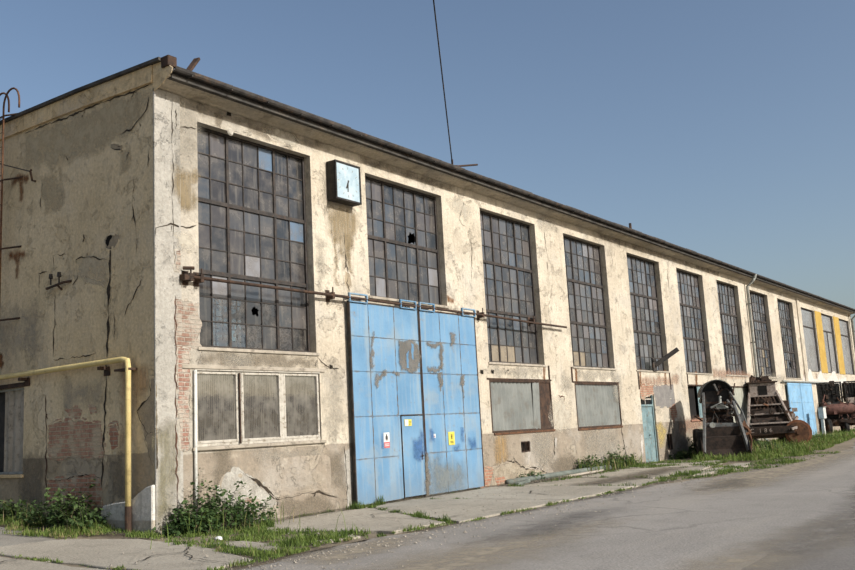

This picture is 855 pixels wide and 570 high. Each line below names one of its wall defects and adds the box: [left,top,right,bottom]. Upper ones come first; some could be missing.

crack [25,84,152,165]
crack [171,101,196,192]
crack [132,182,196,258]
flaking render [47,404,120,461]
crack [39,235,142,501]
crack [172,295,180,511]
flaking render [174,299,202,452]
crack [238,446,348,506]
corrosion [370,332,456,391]
crack [507,436,570,495]
flaking render [640,383,677,424]